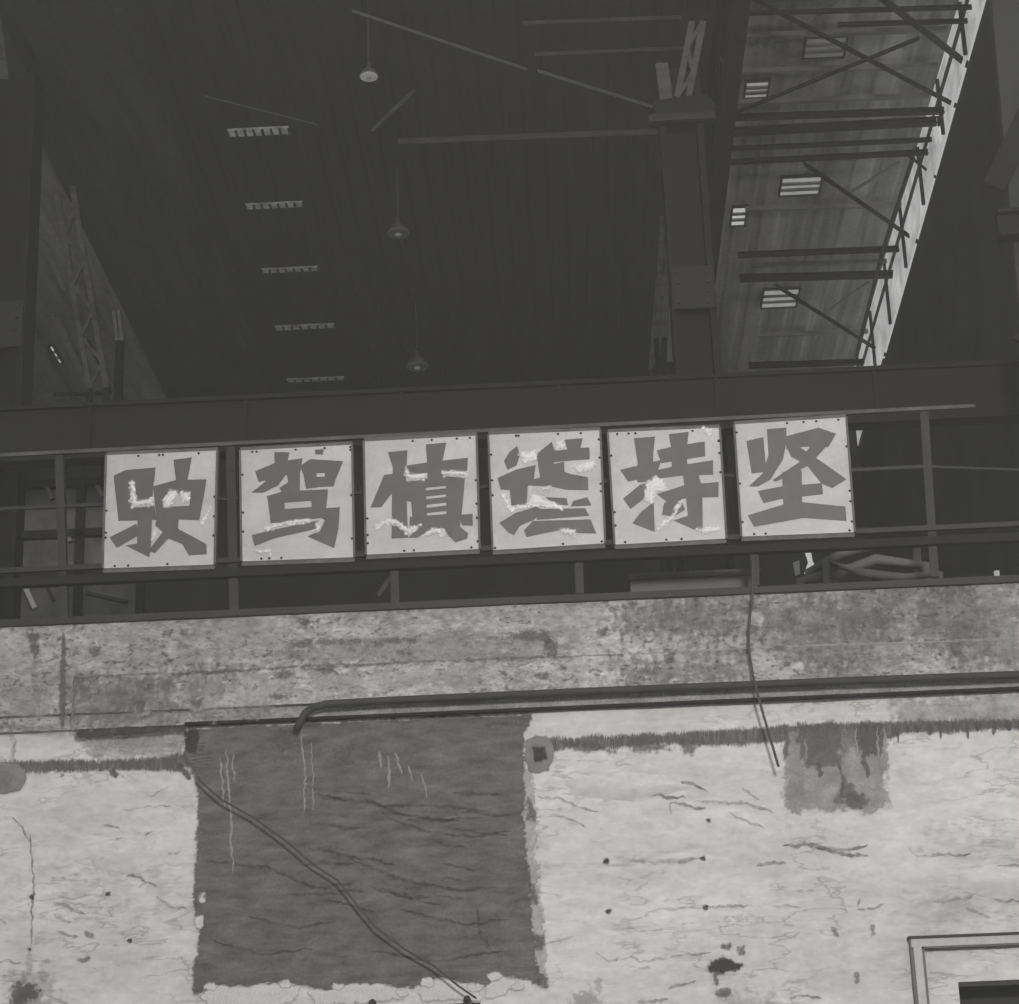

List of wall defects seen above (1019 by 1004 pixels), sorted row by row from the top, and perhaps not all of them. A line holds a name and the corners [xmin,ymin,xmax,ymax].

crack [655,782,706,809]
crack [782,843,868,864]
peeling [522,763,548,988]
peeling [200,972,524,1004]